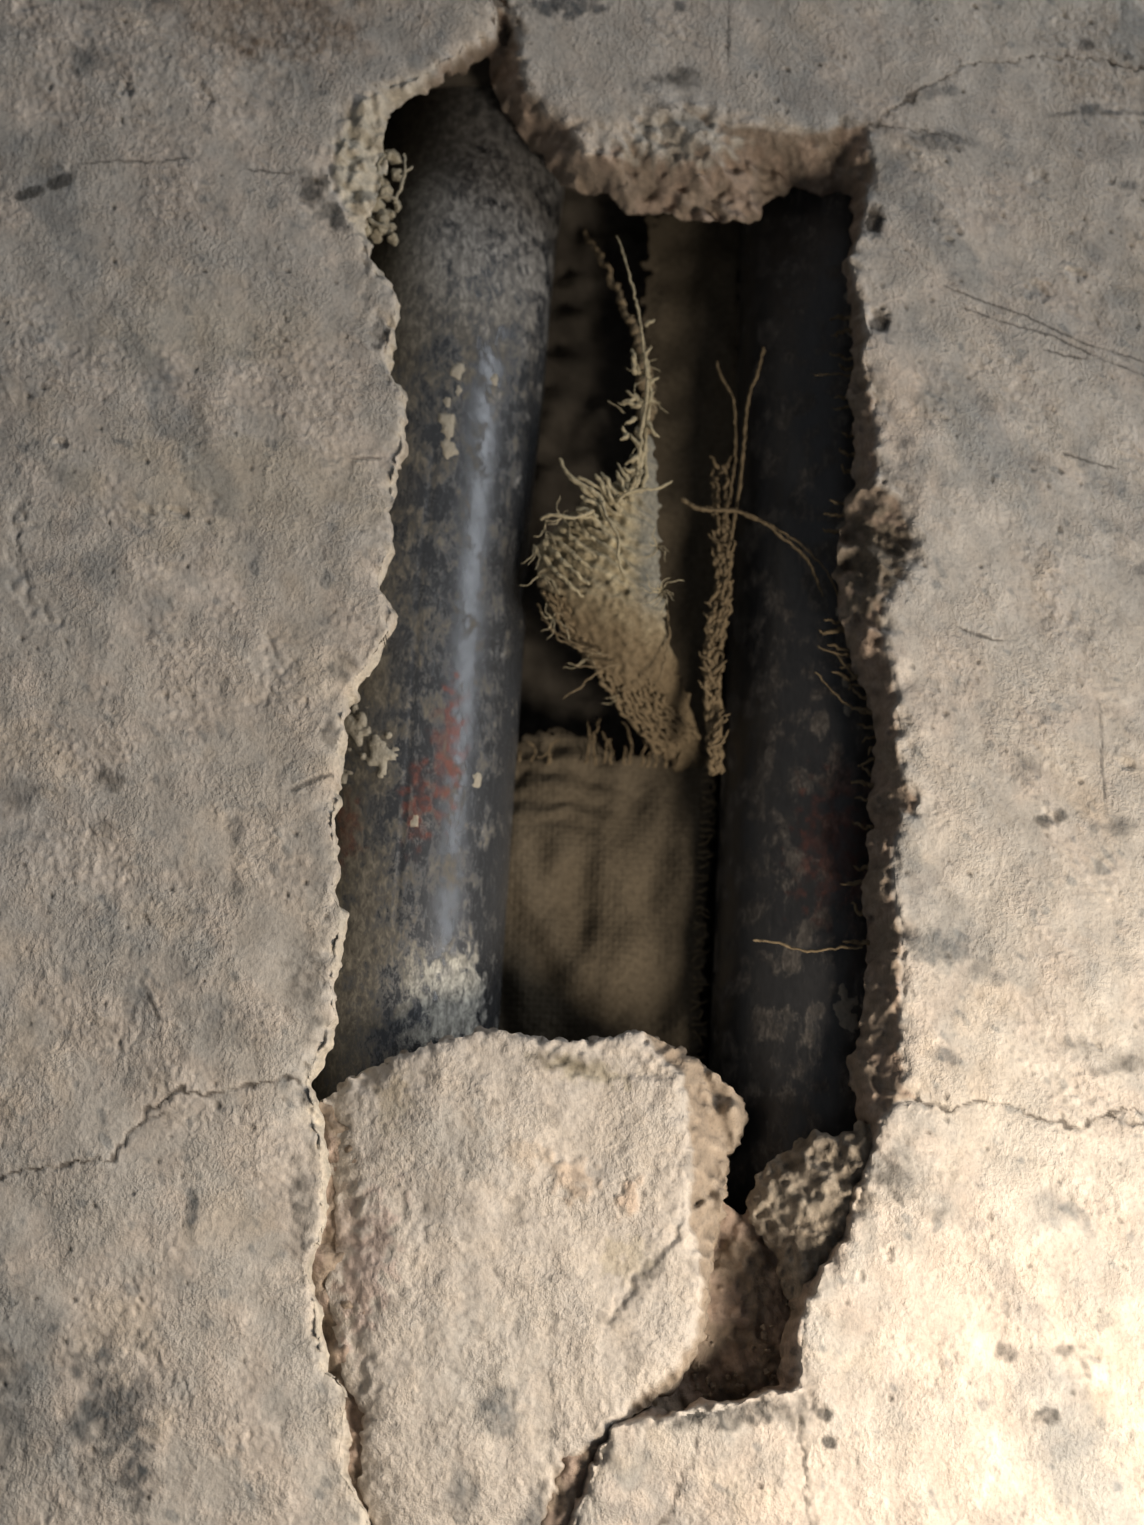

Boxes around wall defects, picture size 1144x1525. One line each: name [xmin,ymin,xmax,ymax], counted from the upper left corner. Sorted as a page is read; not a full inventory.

crack [490,0,518,25]
crack [868,63,977,135]
spalling [305,1,920,1525]
crack [0,1076,299,1180]
crack [920,1100,983,1113]
crack [1029,1107,1144,1129]